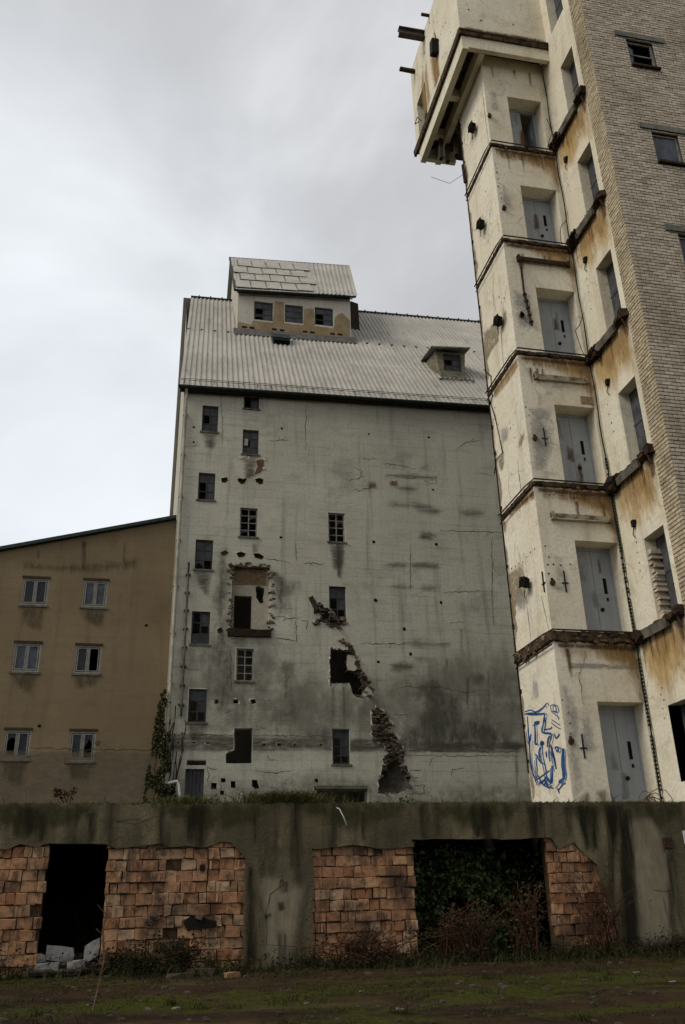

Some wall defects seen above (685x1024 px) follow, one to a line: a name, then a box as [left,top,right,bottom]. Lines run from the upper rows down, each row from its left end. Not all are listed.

peeling [220,455,266,485]
spalling [217,549,276,634]
damp [332,544,342,576]
rust [558,618,685,685]
spalling [312,600,412,797]
damp [405,685,507,746]